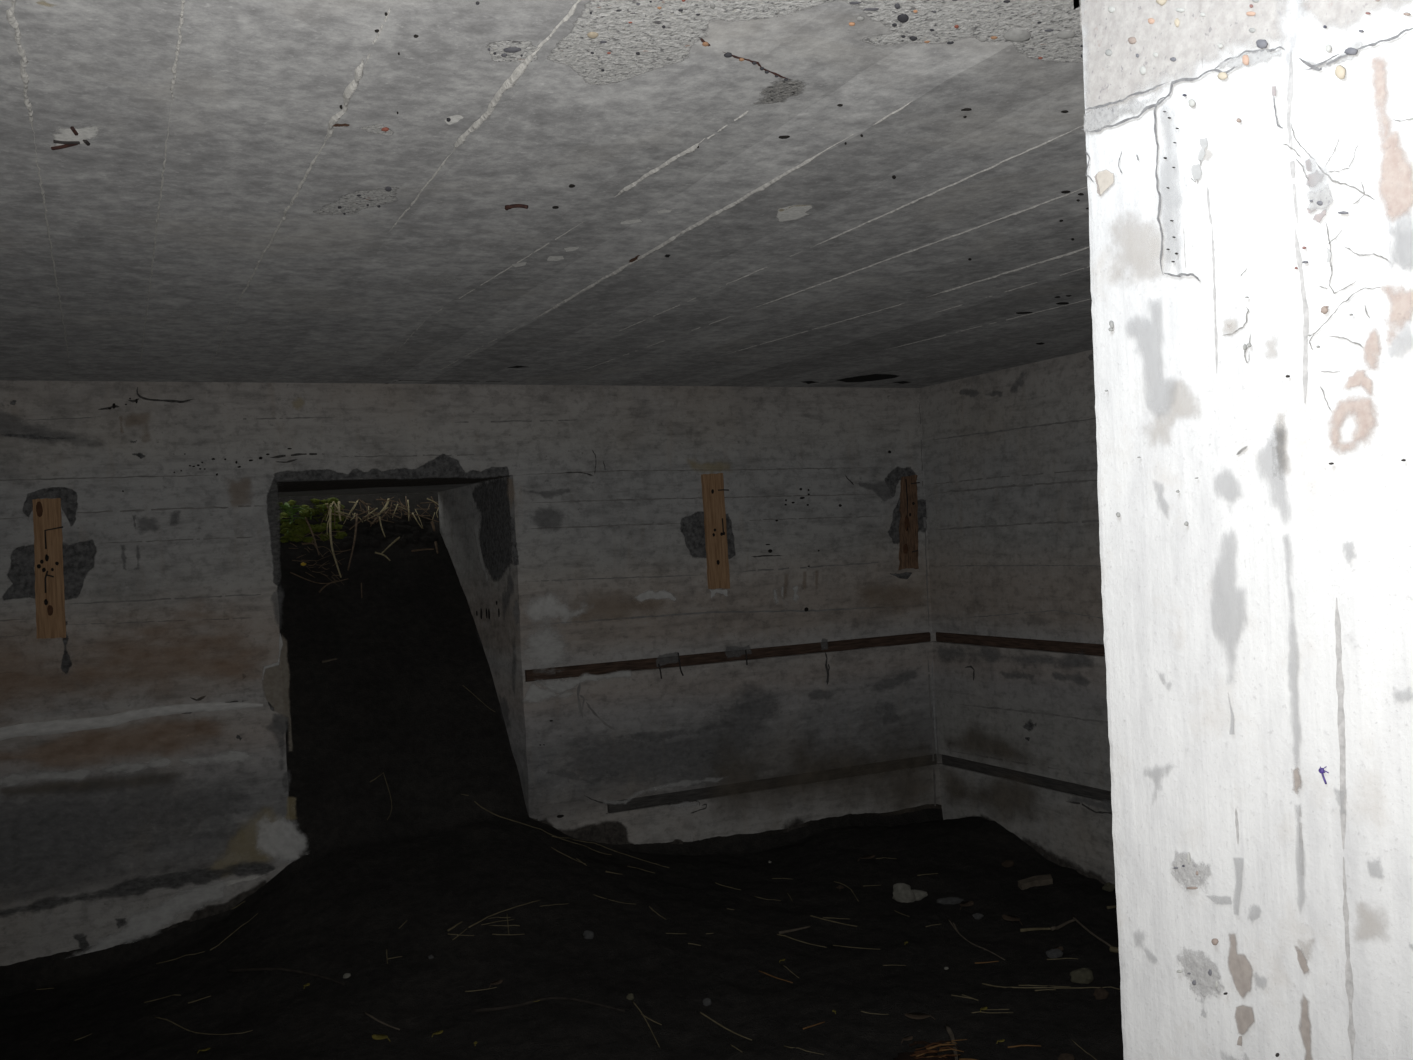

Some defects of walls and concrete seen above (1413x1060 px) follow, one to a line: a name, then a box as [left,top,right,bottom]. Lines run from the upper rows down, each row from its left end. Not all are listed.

spalling [486,0,1286,131]
spalling [1303,0,1411,79]
crack [1082,28,1413,281]
rust [1372,58,1413,220]
crack [1273,96,1389,412]
rust [1331,286,1413,451]
leakage [0,751,250,786]
spalling [1173,852,1210,889]
spalling [1177,950,1228,996]